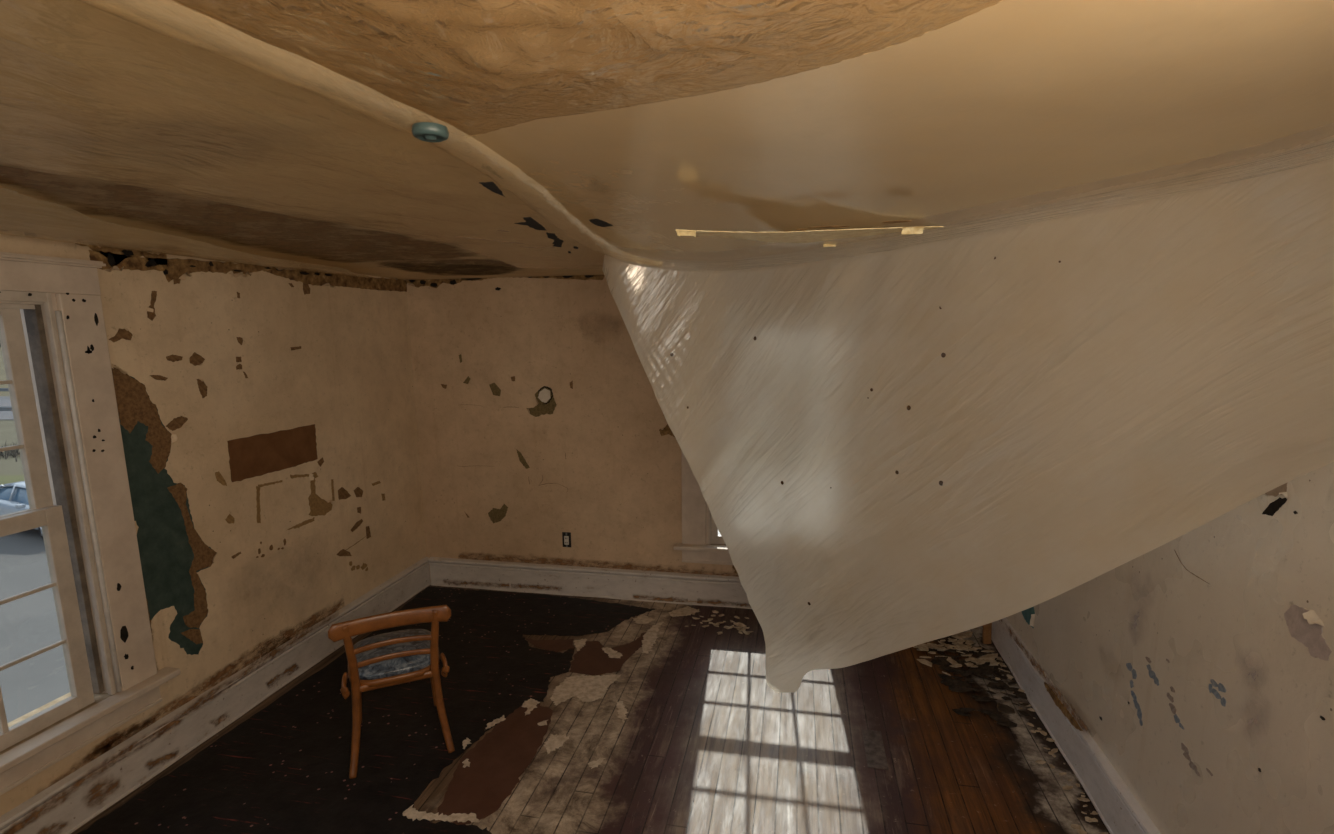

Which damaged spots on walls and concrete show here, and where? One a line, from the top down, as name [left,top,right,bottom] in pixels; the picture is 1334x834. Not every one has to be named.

leakage [0,164,520,275]
peeling [75,239,605,321]
peeling [109,328,133,342]
peeling [166,352,207,398]
peeling [527,386,557,417]
peeling [111,363,286,655]
peeling [308,457,385,539]
peeling [487,504,508,523]
peeling [1262,482,1298,516]
peeling [120,626,134,670]
peeling [1021,606,1036,628]
peeling [1284,605,1332,661]